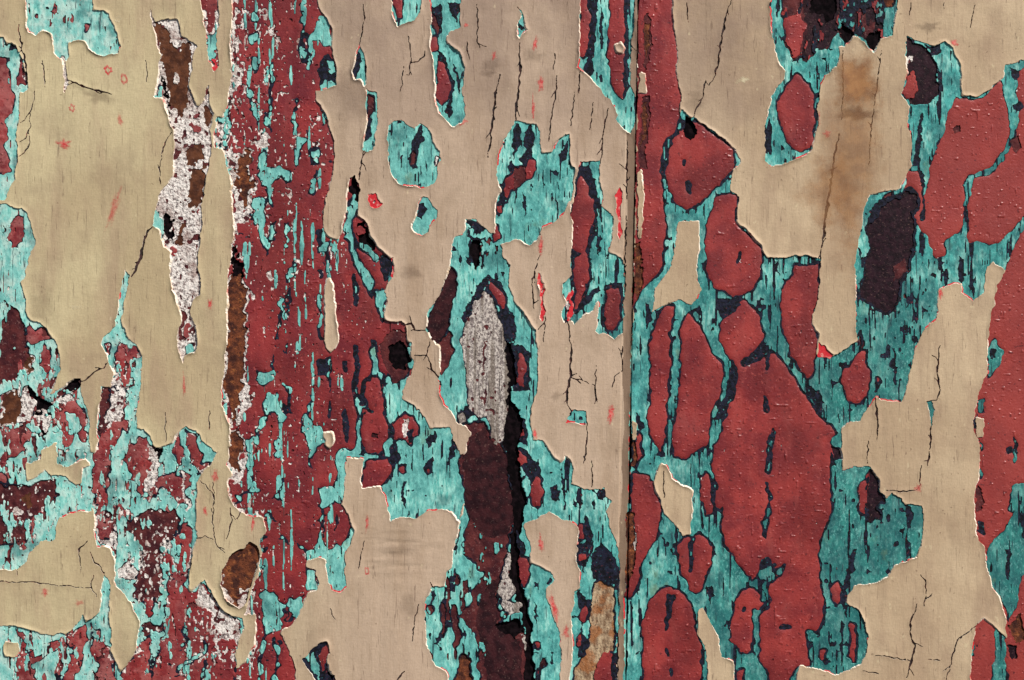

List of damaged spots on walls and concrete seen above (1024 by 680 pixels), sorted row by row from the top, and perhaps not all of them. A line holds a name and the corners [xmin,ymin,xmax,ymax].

crack [400,36,425,91]
crack [485,43,522,158]
crack [693,0,732,117]
crack [548,53,630,293]
peeling [0,0,626,680]
crack [531,254,623,487]
peeling [577,0,1024,680]
crack [867,398,879,464]
crack [886,427,932,493]
crack [926,346,940,402]
crack [0,540,105,597]
crack [863,575,975,680]